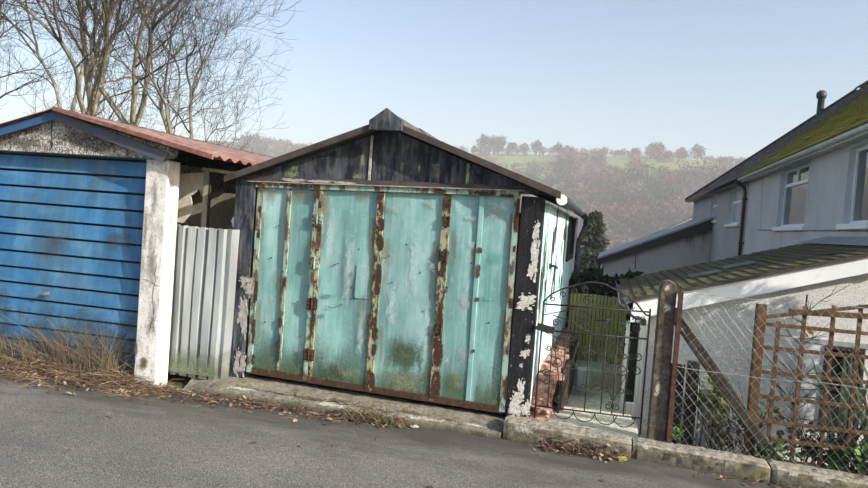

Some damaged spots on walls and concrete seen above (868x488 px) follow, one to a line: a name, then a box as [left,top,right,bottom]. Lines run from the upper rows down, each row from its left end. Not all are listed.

corrosion [370,218,389,295]
peeling [233,276,255,378]
corrosion [366,316,383,356]
corrosion [428,226,456,399]
peeling [508,206,568,418]